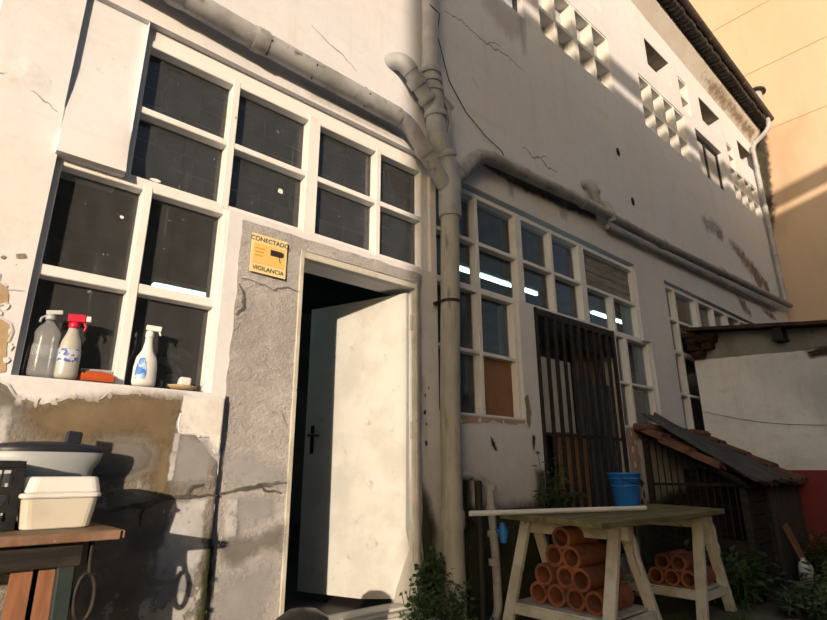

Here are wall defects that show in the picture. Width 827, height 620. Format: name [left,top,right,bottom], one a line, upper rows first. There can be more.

crack [444,10,524,71]
crack [523,147,558,172]
peeling [0,274,149,443]
peeling [461,392,535,449]
peeling [68,395,225,620]
crack [108,481,287,526]
peeling [0,572,10,620]